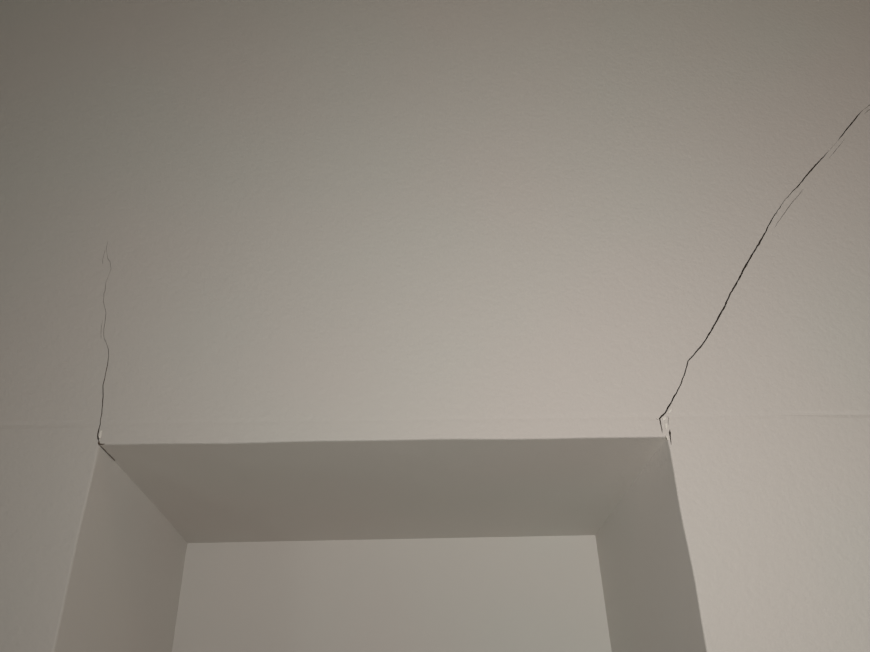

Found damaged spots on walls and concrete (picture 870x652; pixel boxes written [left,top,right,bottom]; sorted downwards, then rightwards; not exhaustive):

crack [97,242,115,461]
crack [657,105,870,442]